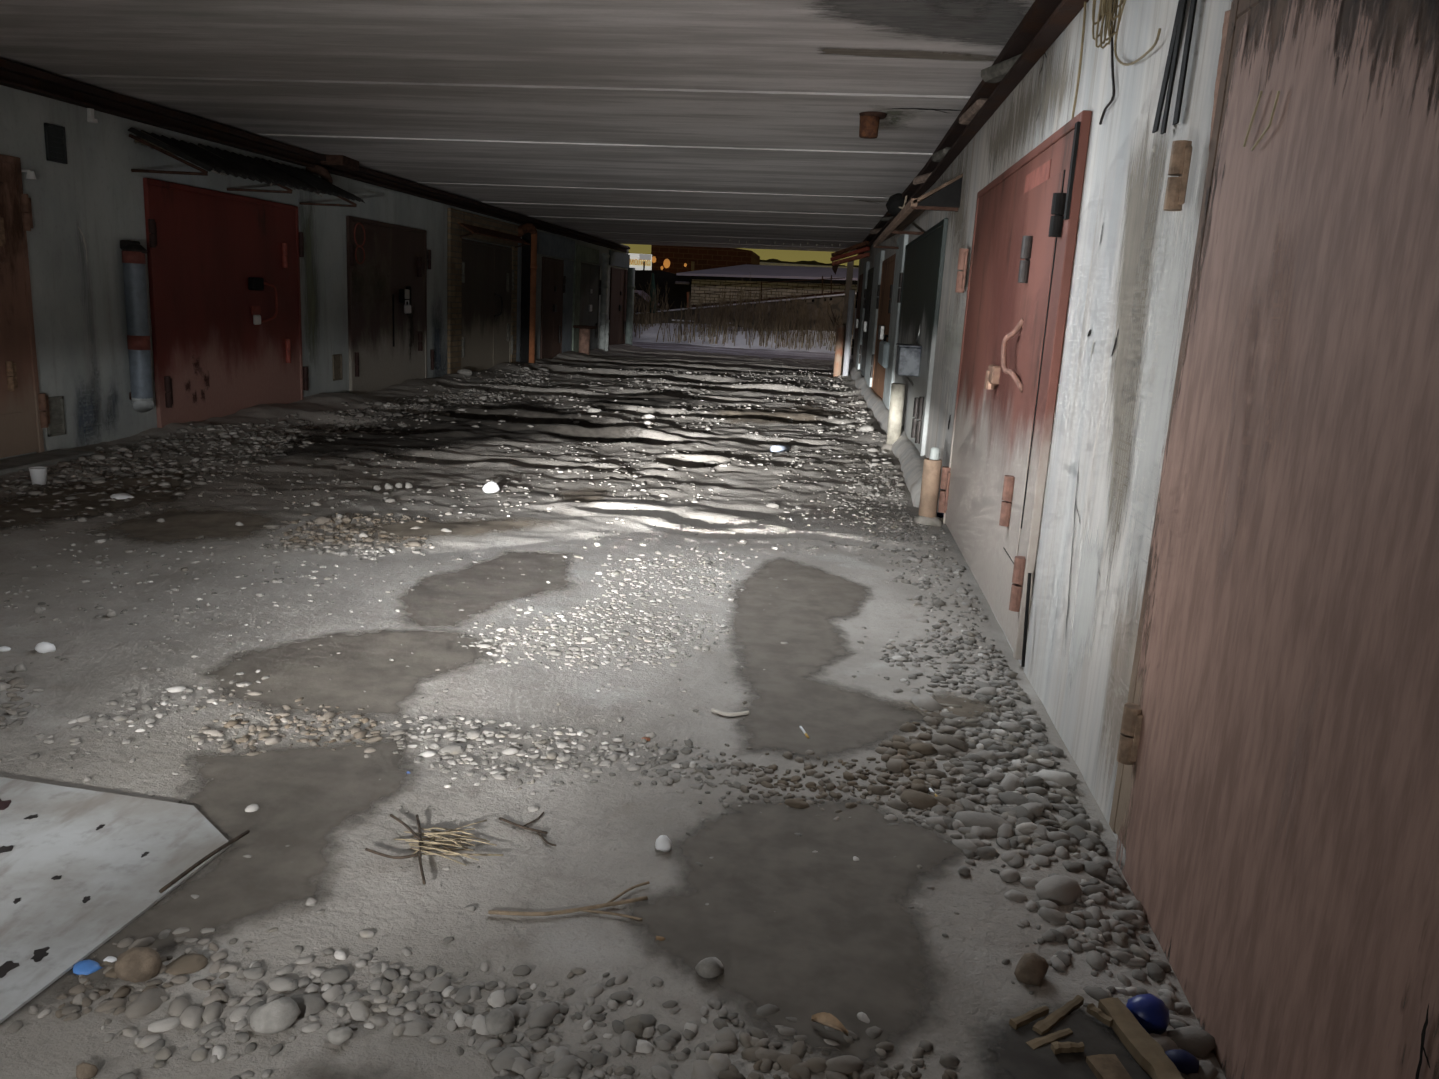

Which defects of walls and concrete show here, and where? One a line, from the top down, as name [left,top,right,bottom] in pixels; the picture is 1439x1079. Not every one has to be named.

leakage [814,0,1031,46]